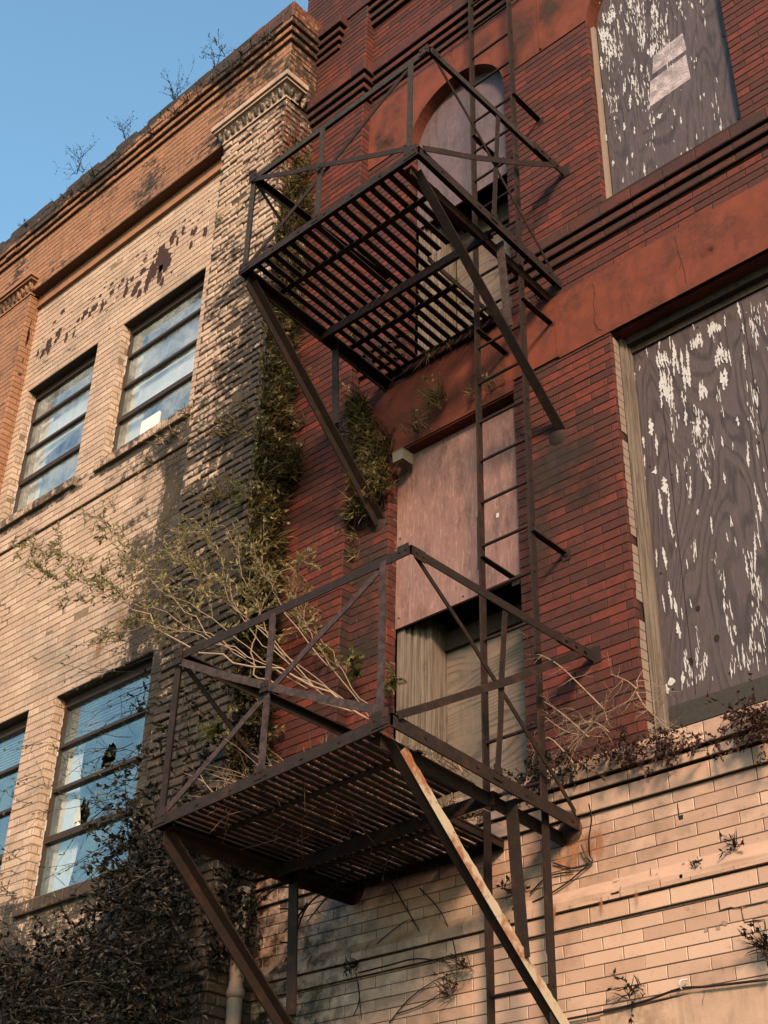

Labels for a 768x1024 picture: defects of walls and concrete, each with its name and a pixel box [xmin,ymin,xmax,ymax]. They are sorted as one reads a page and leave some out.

peeling [598,0,706,151]
peeling [18,197,210,376]
peeling [634,301,768,678]
peeling [666,627,713,694]